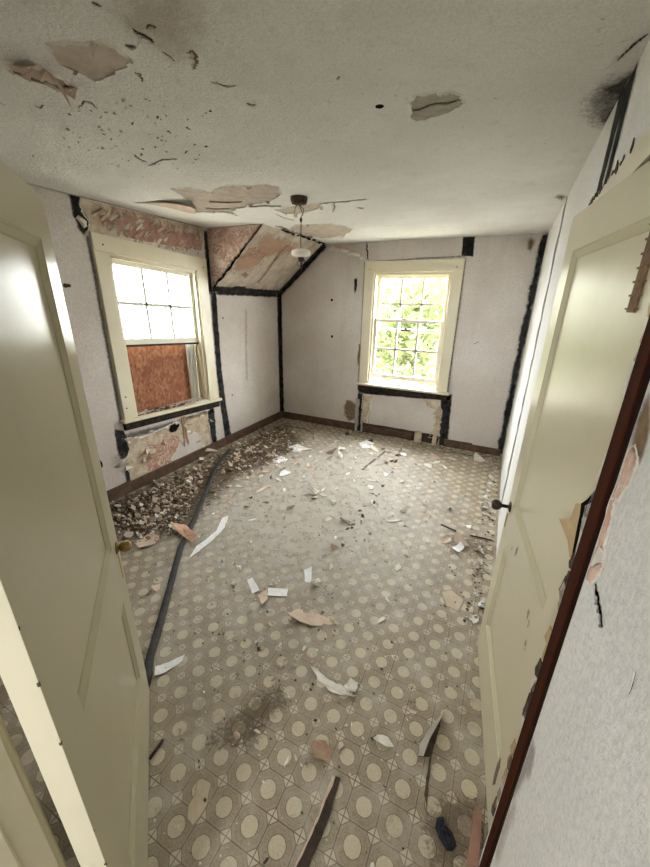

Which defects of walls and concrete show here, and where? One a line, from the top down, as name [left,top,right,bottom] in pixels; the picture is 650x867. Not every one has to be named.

peeling [0,38,208,169]
peeling [136,184,353,240]